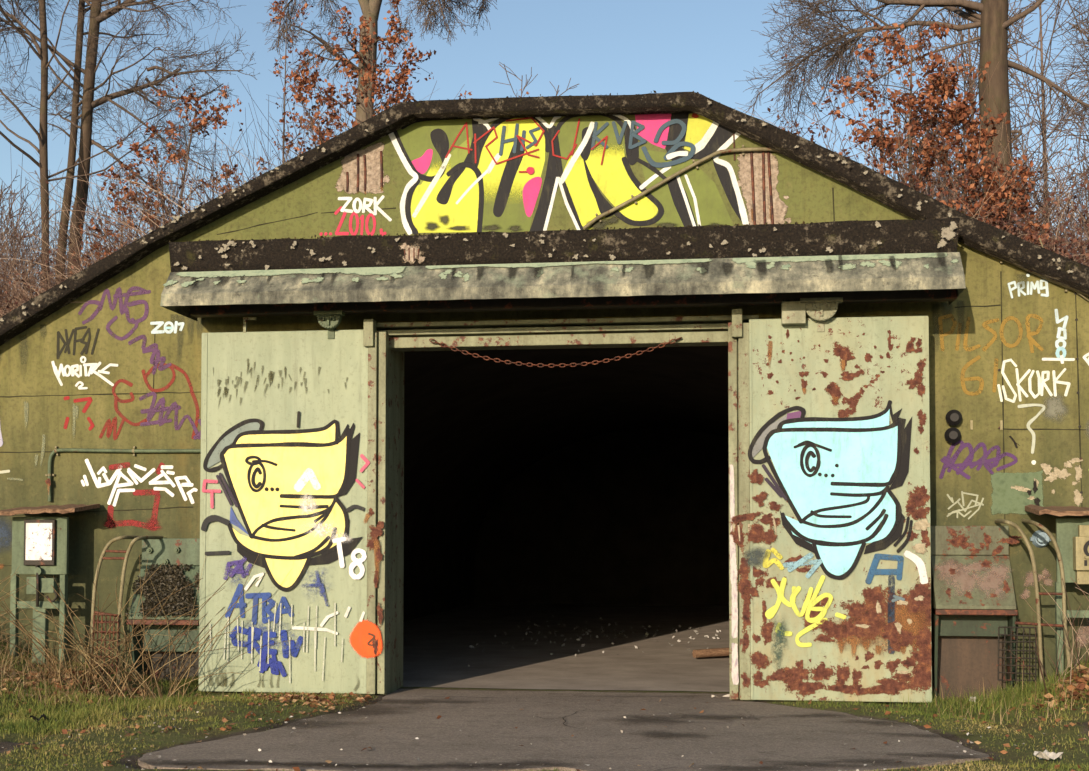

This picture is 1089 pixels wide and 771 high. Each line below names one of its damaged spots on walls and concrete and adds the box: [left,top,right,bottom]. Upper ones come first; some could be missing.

spalling [335,142,390,195]
spalling [733,134,791,225]
peeling [163,243,712,287]
rust [766,329,926,418]
rust [917,409,927,434]
rust [364,508,384,588]
rust [730,469,932,697]